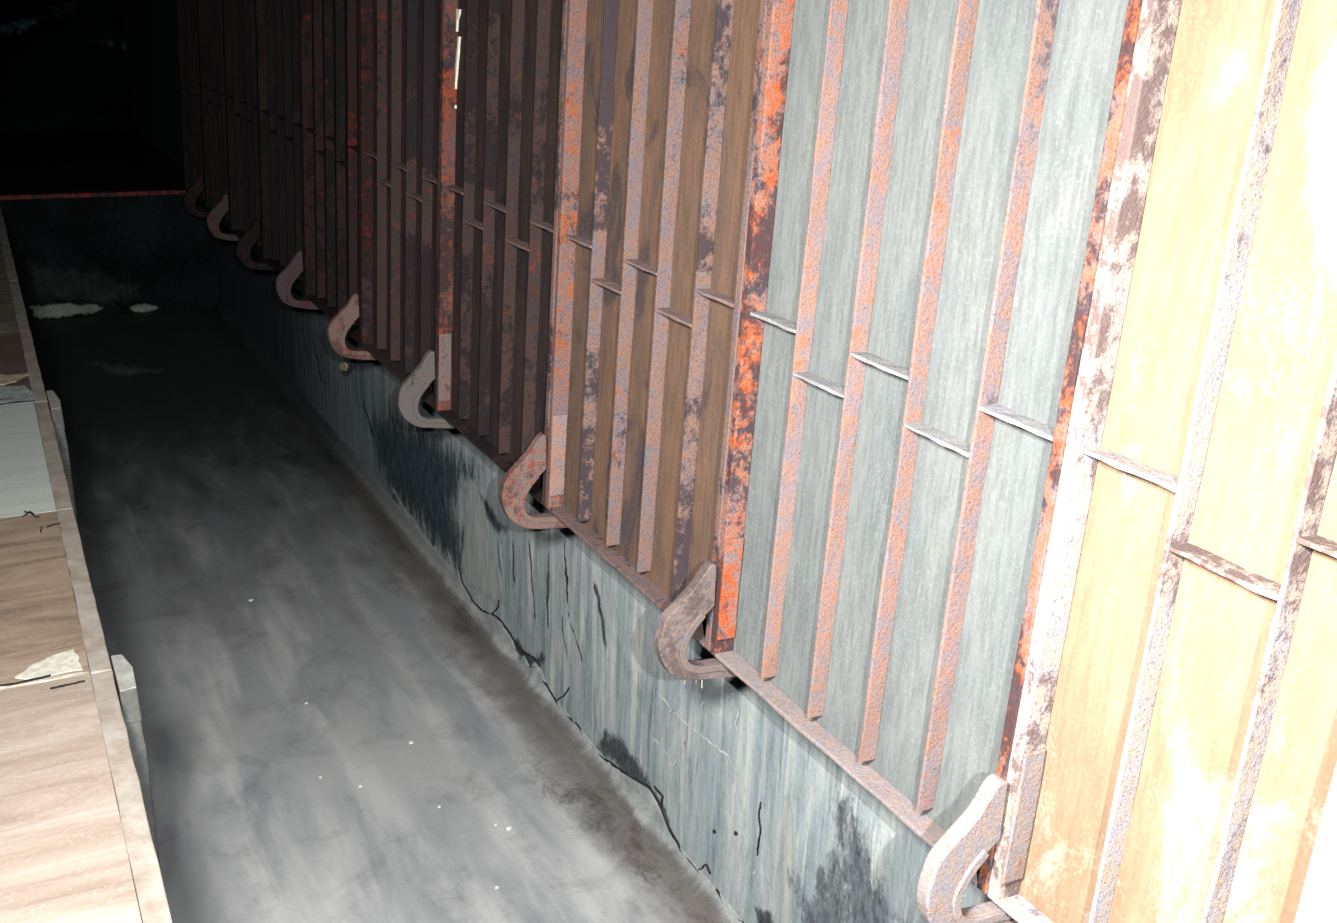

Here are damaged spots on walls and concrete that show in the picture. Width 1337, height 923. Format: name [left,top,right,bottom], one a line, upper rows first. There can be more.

crack [458,565,744,923]
crack [752,771,773,875]
water stain [780,798,889,923]